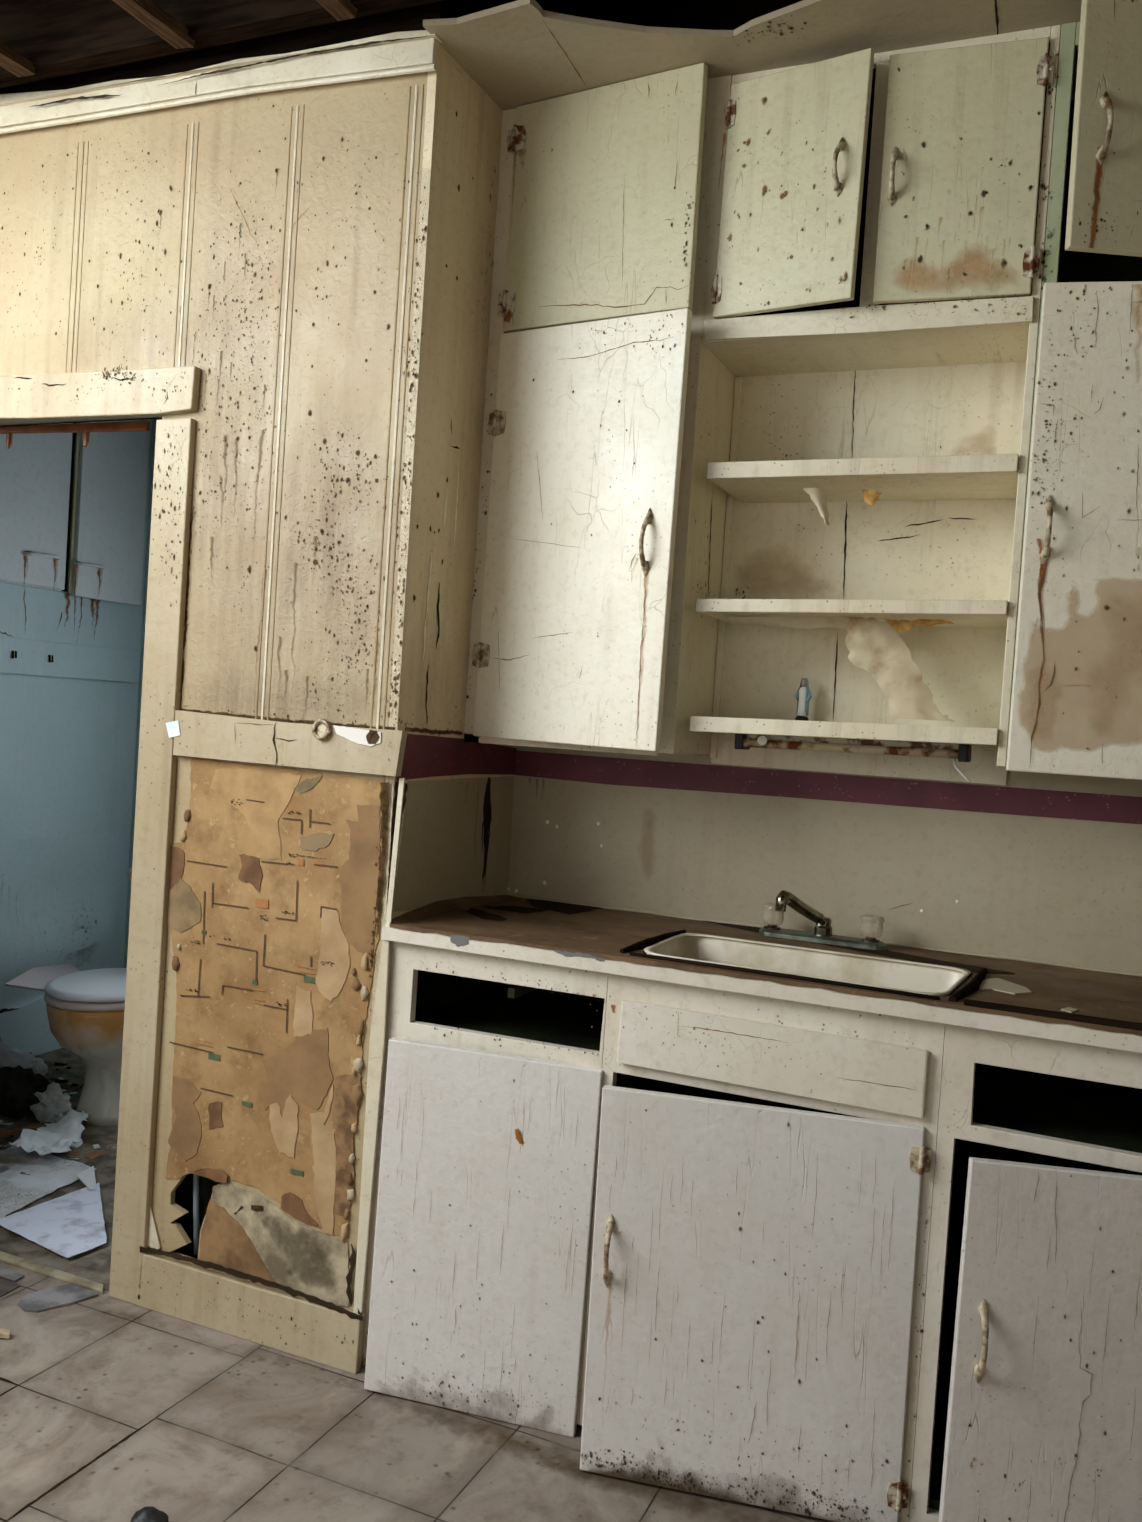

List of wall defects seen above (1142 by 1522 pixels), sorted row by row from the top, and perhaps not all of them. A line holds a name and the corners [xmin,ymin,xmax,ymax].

crack [992,0,1000,35]
rust [59,592,100,635]
peeling [180,809,191,842]
crack [481,777,492,890]
peeling [172,944,181,972]
peeling [351,953,369,1133]
flaking render [211,1153,355,1307]